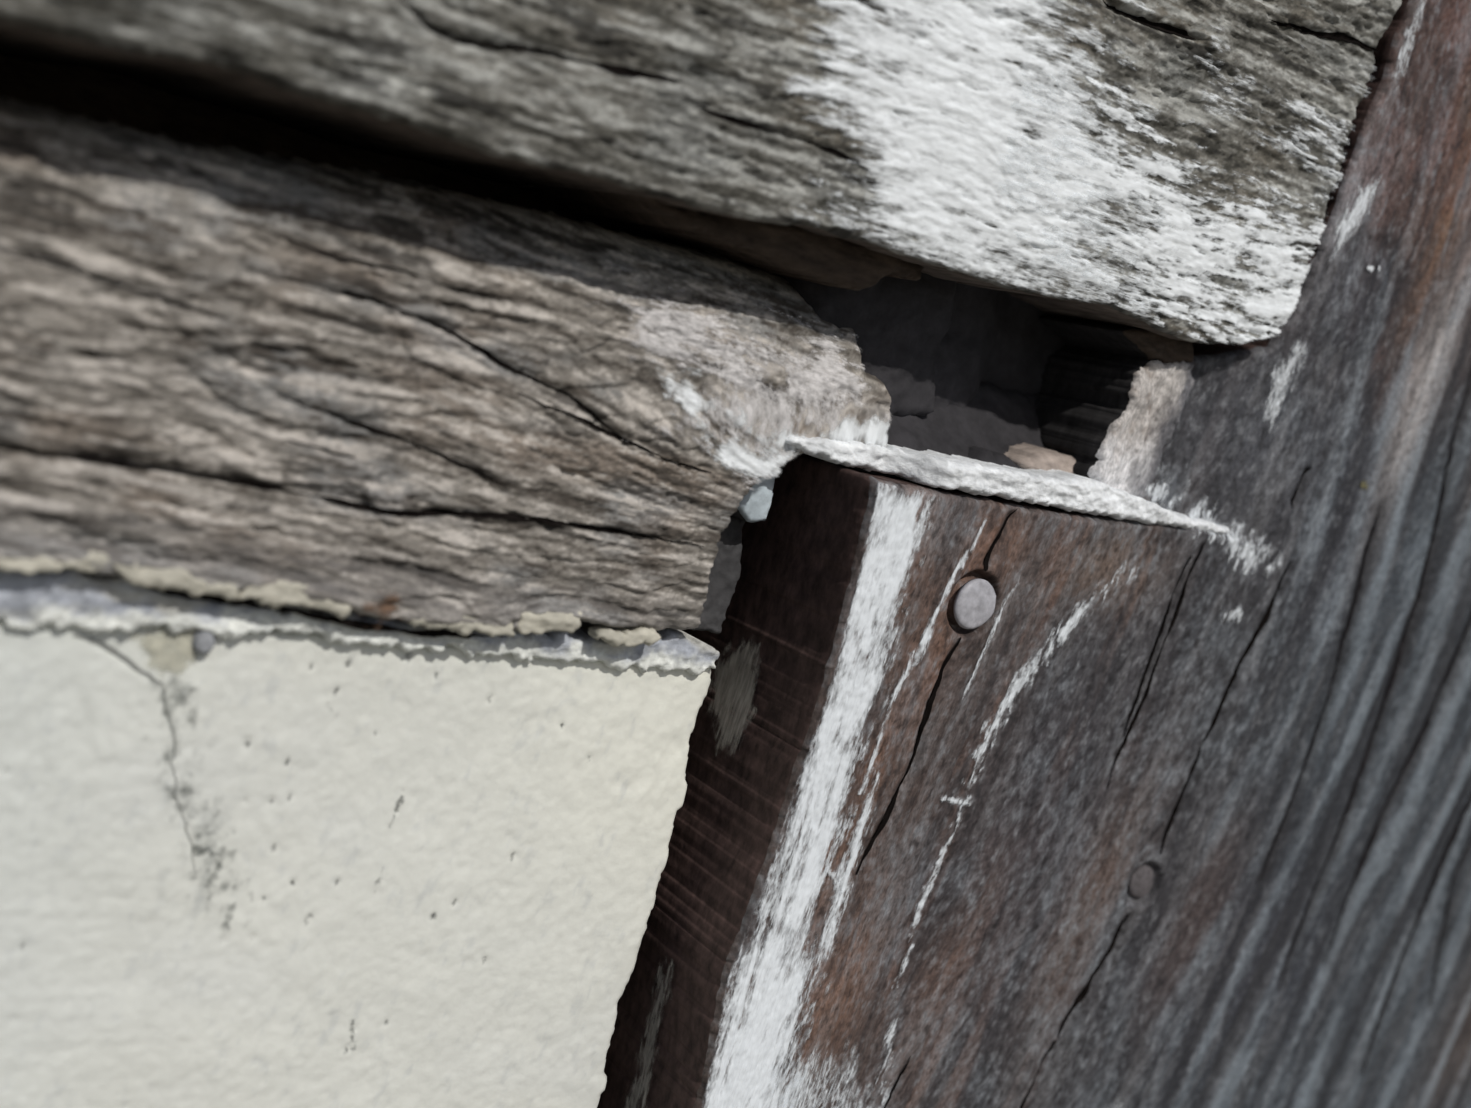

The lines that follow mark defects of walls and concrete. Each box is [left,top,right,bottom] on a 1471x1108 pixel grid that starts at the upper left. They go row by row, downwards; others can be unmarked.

crack [249,222,712,473]
crack [73,635,196,873]
spalling [141,629,196,673]
peeling [0,550,353,619]
peeling [403,609,661,647]
crack [856,637,961,874]
crack [984,509,1017,571]
crack [1107,543,1205,789]
crack [1160,559,1293,854]
crack [1291,467,1311,507]
crack [1020,913,1130,1108]